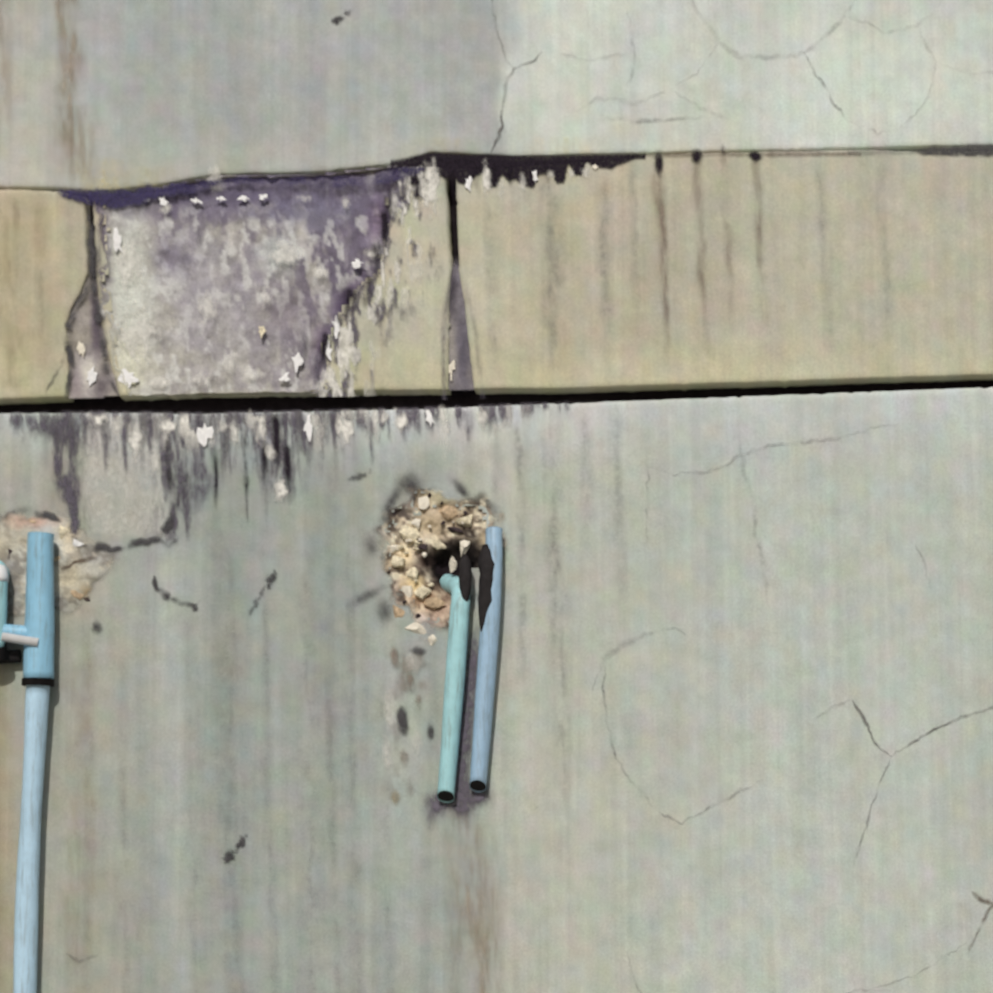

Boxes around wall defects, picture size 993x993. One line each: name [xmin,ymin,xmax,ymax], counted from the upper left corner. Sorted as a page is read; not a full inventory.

damp [655,150,701,171]
damp [918,144,993,156]
spalling [59,152,646,398]
peeling [478,403,547,428]
peeling [0,407,469,622]
spalling [376,477,494,682]
peeling [397,707,408,733]
crack [854,703,879,747]